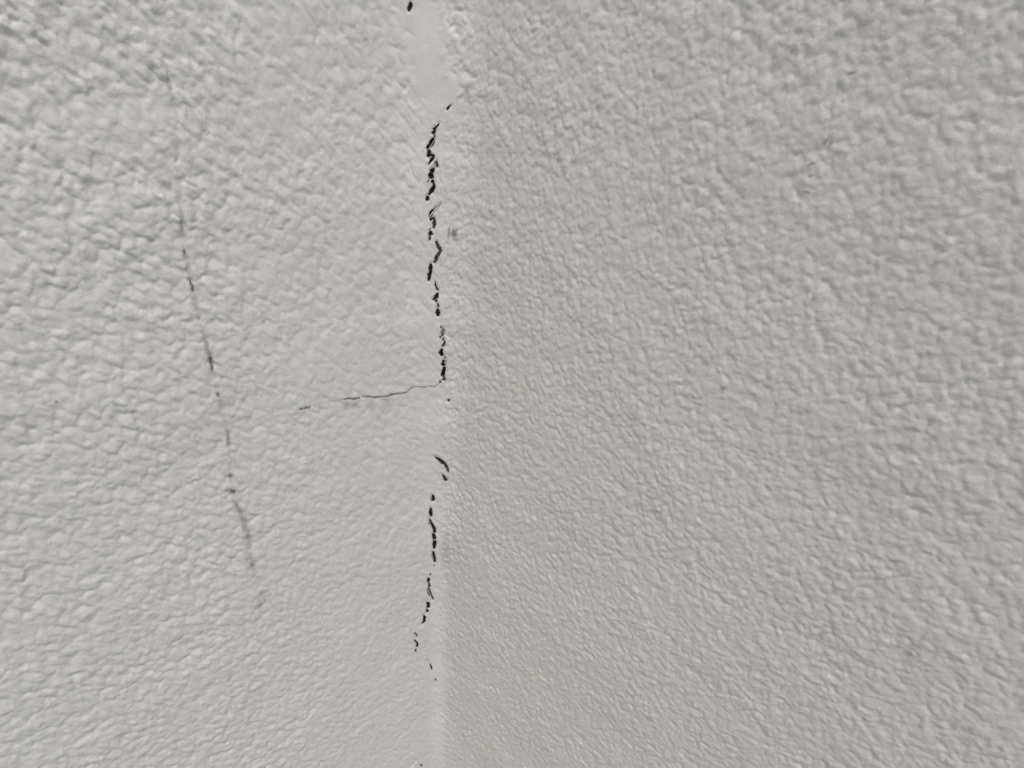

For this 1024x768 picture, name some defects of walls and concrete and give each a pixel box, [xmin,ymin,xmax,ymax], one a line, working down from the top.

crack [345,122,446,399]
crack [414,457,449,680]